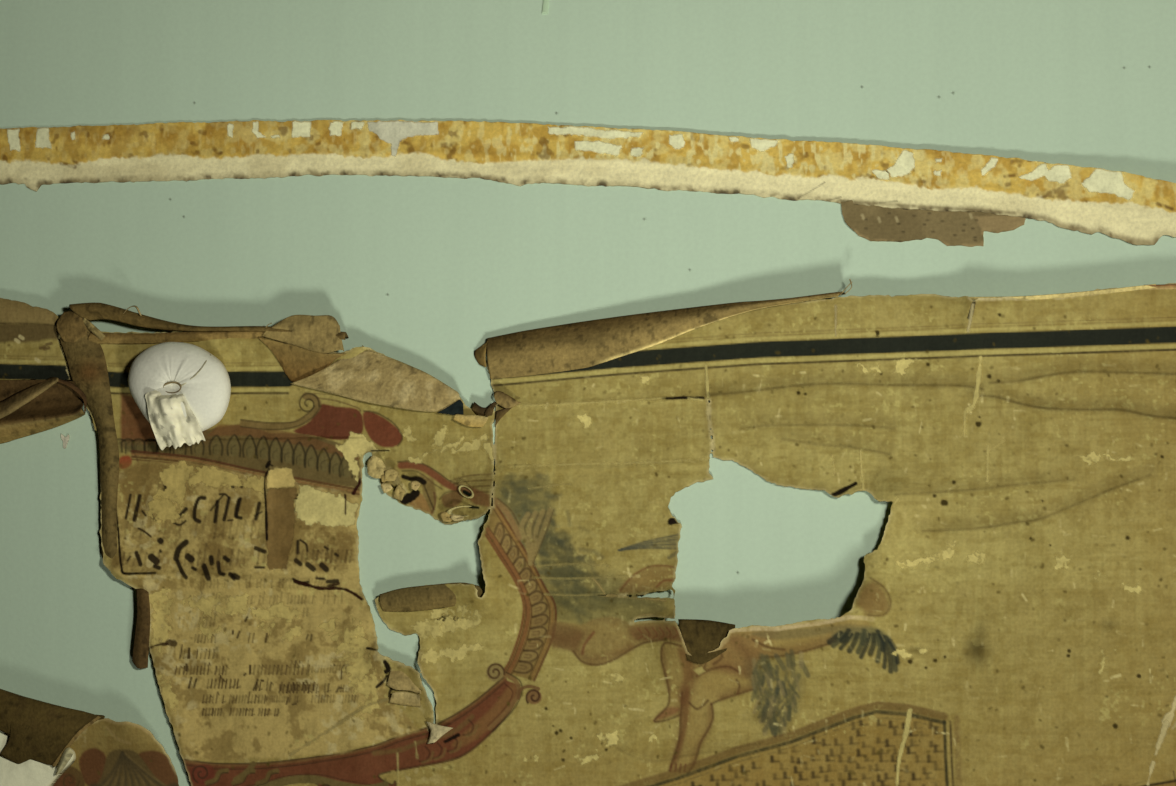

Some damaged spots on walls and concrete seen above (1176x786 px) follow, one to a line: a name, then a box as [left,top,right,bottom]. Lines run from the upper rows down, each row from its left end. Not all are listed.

peeling [7,129,20,151]
peeling [35,128,52,148]
peeling [252,121,311,138]
peeling [329,121,439,156]
peeling [548,126,643,157]
peeling [669,134,685,149]
peeling [729,137,778,151]
peeling [872,150,915,180]
peeling [1020,164,1134,200]
peeling [149,587,302,653]
peeling [411,605,484,664]
peeling [319,615,381,720]